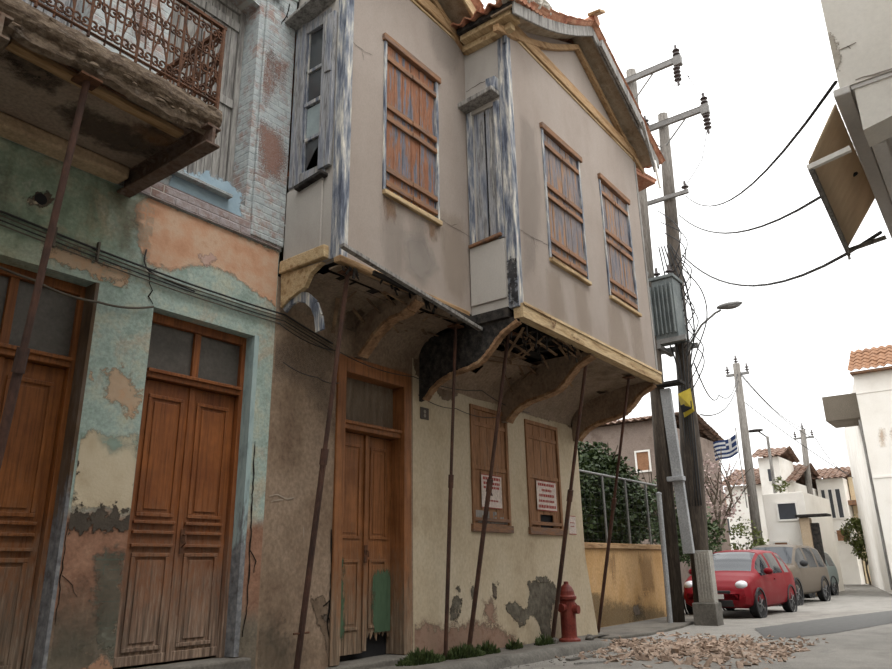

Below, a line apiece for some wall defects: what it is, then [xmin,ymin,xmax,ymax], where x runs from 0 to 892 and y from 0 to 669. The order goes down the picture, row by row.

flaking render [262,46,289,107]
damp [55,102,167,157]
flaking render [258,119,288,182]
peeling [49,244,130,287]
peeling [134,198,279,307]
peeling [89,366,143,419]
peeling [68,429,139,536]
crack [242,445,283,637]
peeling [415,576,556,655]
peeling [82,654,113,669]